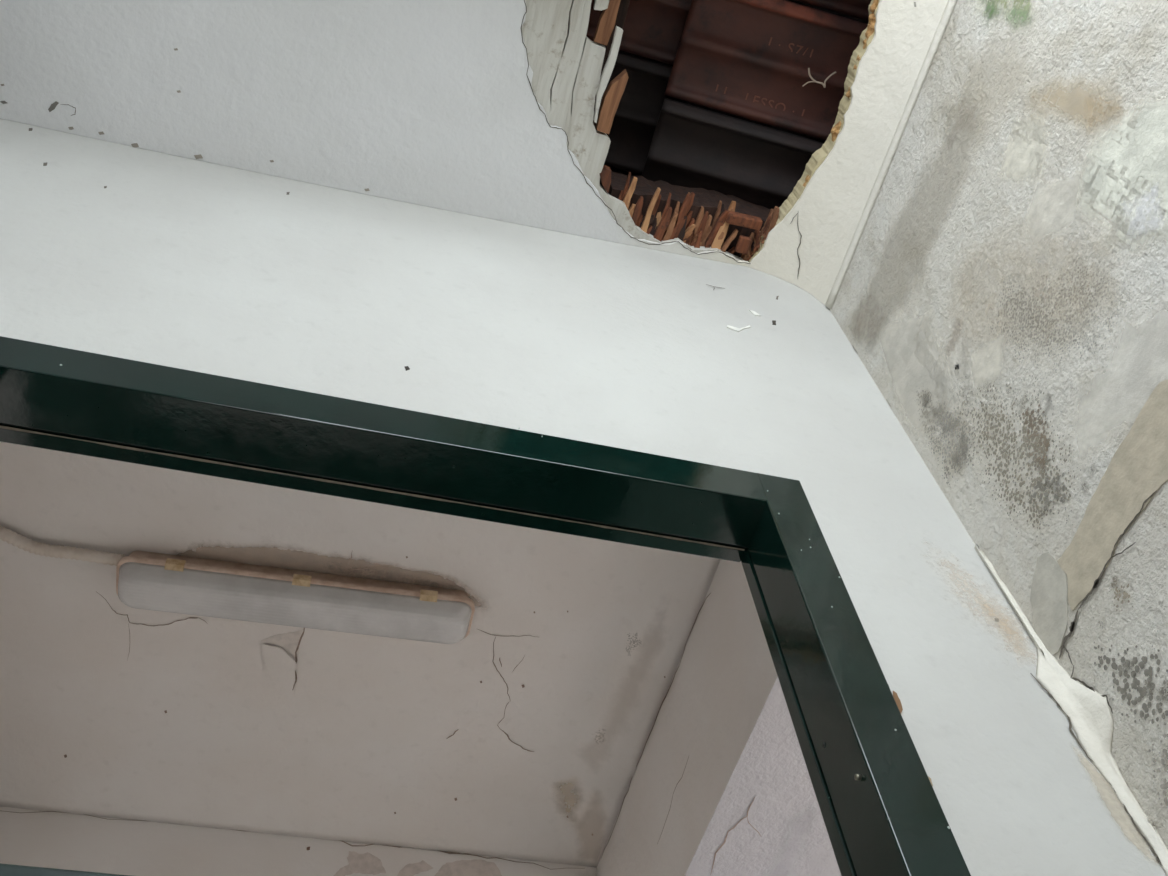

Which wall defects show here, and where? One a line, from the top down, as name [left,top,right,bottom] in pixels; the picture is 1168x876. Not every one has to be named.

spalling [774,0,880,227]
leakage [1003,100,1168,242]
leakage [882,318,1168,537]
crack [1031,490,1163,866]
leakage [1111,576,1133,611]
leakage [1094,621,1168,806]
peeling [334,851,433,876]